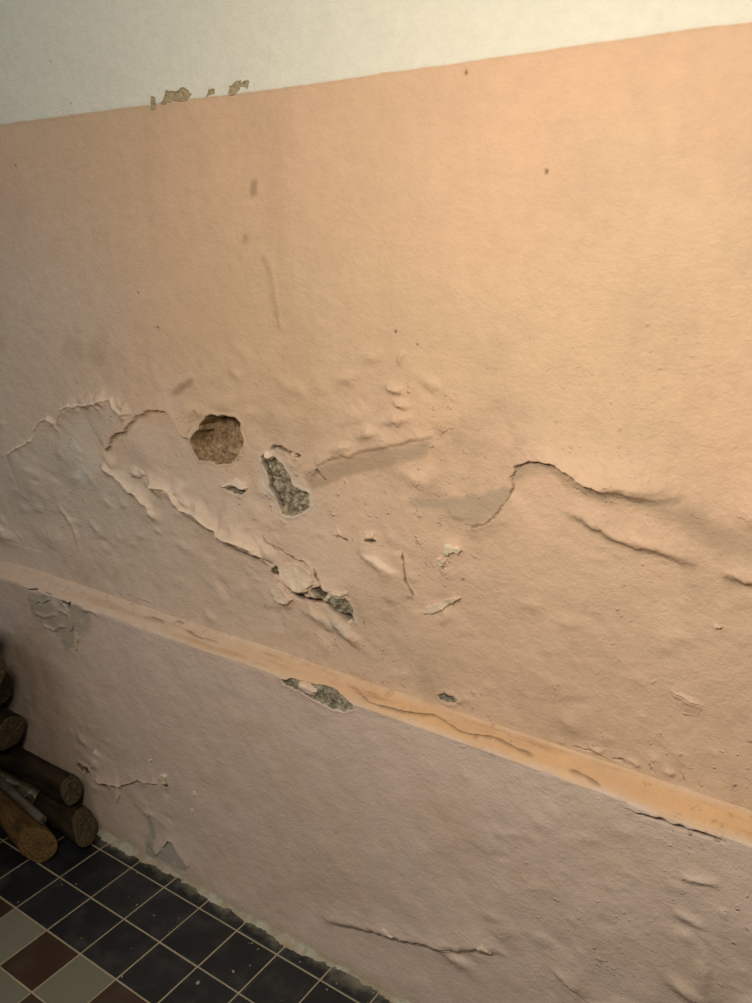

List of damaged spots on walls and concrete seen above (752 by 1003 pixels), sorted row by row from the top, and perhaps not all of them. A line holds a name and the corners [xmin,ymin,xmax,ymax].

peeling [147,71,254,115]
flaking render [101,401,384,656]
flaking render [18,575,99,665]
flaking render [275,666,362,717]
peeling [74,741,171,803]
water stain [140,807,194,877]